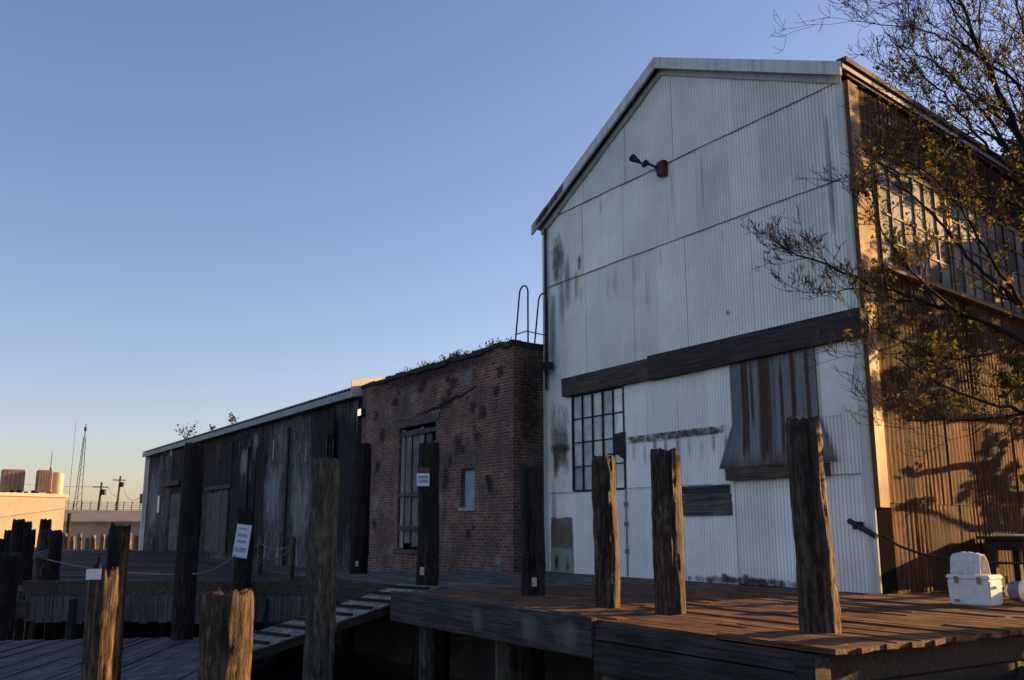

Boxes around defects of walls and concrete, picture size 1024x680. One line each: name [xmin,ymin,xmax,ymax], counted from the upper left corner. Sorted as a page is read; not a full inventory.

damp [550,245,568,353]
crack [416,385,477,420]
damp [552,427,567,467]
corrosion [740,351,812,459]